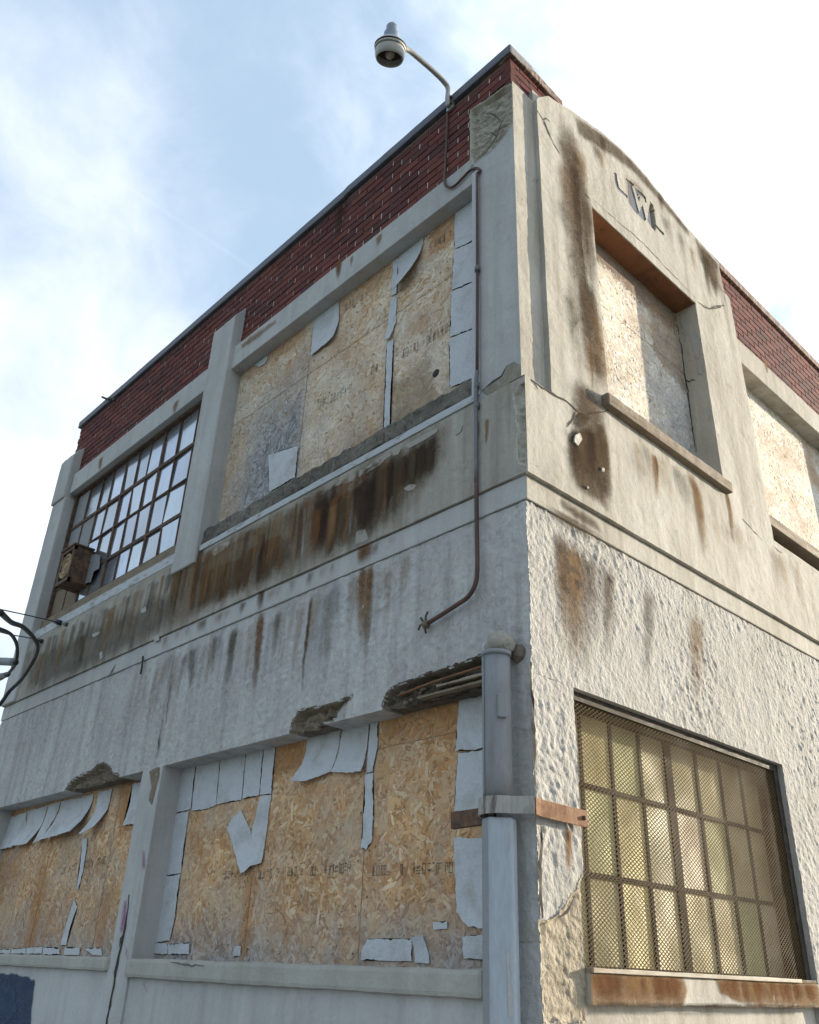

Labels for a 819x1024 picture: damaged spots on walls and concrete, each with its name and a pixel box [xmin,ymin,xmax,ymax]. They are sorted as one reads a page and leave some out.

spalling [469,83,514,167]
leakage [562,122,688,367]
spalling [482,363,528,474]
crack [482,362,608,427]
leakage [570,388,610,502]
rust [358,545,372,631]
leakage [559,540,613,617]
rust [255,615,263,669]
spalling [381,653,482,710]
flaking render [538,873,588,1024]
rust [590,970,687,1006]
rust [717,979,819,1007]